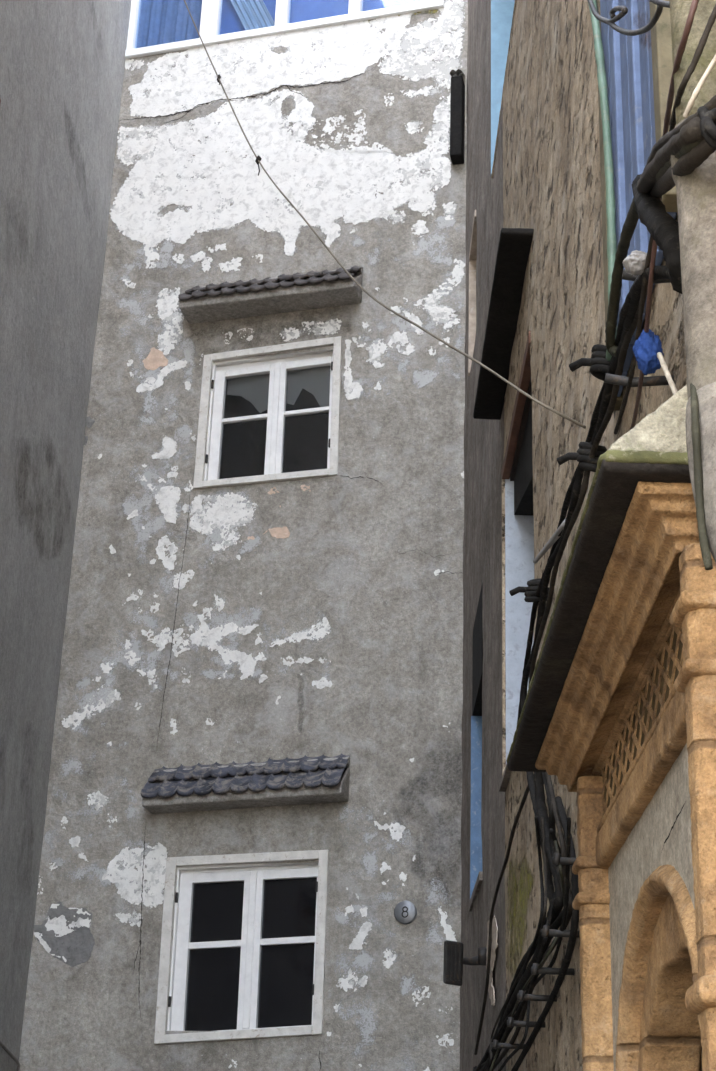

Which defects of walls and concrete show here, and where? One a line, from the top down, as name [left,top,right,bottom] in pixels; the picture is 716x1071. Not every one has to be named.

crack [120,68,373,123]
peeling [110,0,466,273]
peeling [127,287,203,393]
peeling [127,435,290,590]
crack [156,488,191,751]
peeling [141,594,333,689]
peeling [61,662,121,730]
spalling [34,902,95,967]
peeling [102,842,168,927]
crack [134,826,146,1018]
peeling [345,888,372,950]
peeling [438,906,458,942]